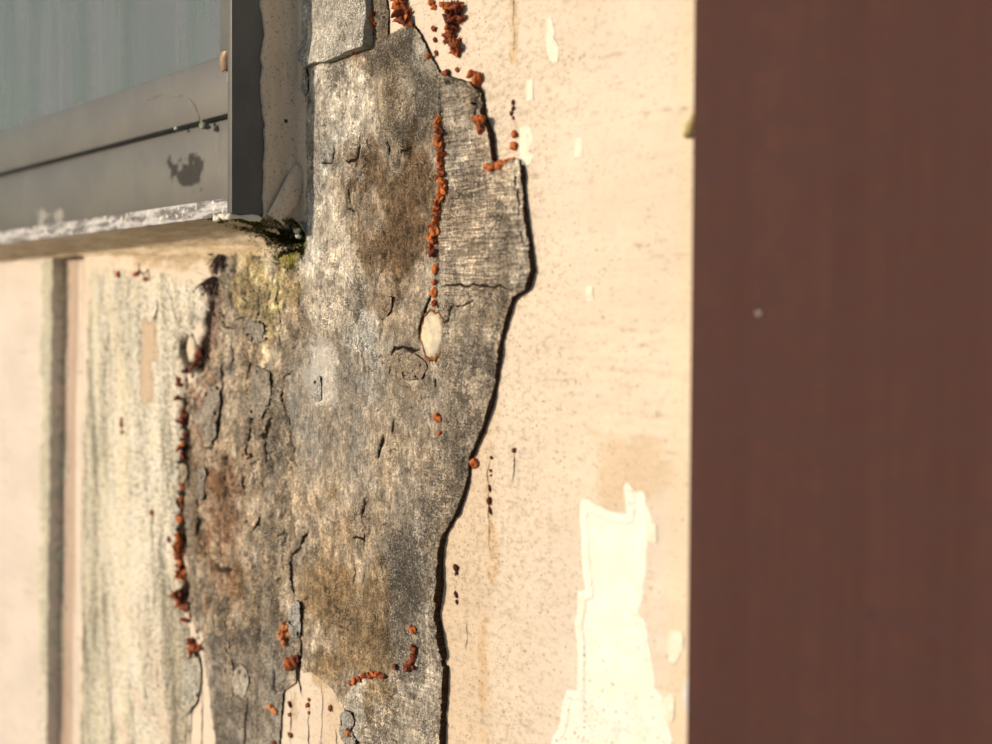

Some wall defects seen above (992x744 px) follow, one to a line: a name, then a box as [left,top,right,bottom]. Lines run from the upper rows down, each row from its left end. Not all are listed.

damp [193,254,229,304]
crack [392,283,510,354]
crack [151,284,300,598]
crack [378,418,395,459]
crack [354,499,366,542]
crack [289,531,309,593]
peeling [550,483,675,744]
peeling [668,631,684,663]
crack [189,675,204,744]
crack [242,700,250,744]
crack [273,637,360,744]